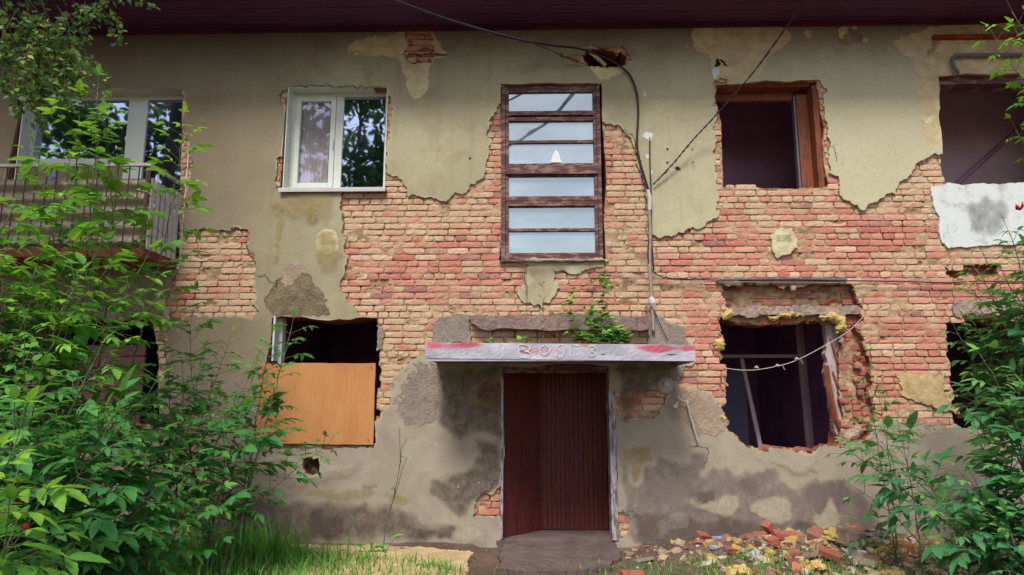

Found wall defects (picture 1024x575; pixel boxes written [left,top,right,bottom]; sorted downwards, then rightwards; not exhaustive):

spalling [153,95,330,379]
spalling [340,24,1024,437]
water stain [195,493,424,541]
water stain [438,444,497,544]
spalling [473,487,500,518]
water stain [624,447,875,543]